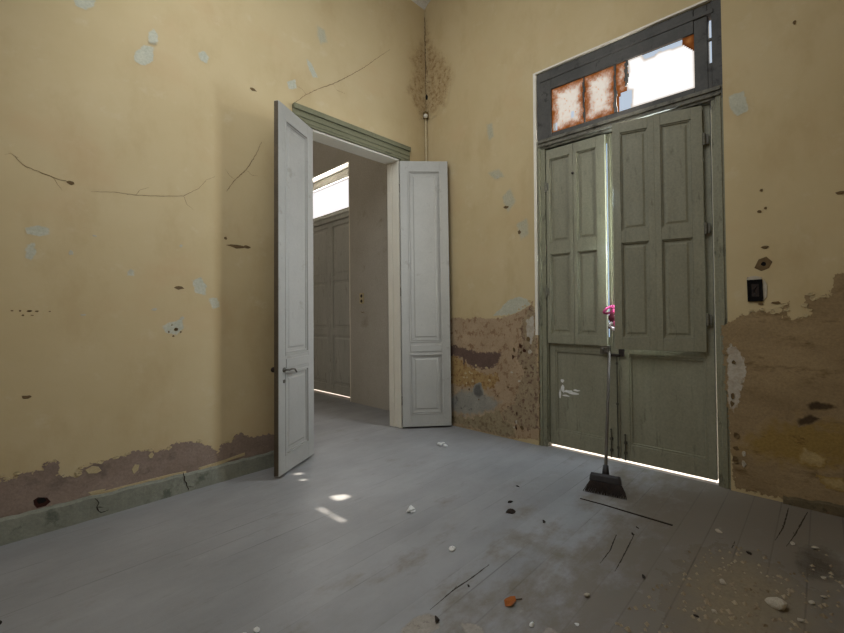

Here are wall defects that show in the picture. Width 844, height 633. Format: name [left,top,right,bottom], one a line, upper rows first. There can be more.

peeling [133,28,159,66]
crack [296,54,383,102]
crack [9,153,66,186]
peeling [450,296,541,442]
peeling [720,273,844,505]
peeling [0,432,274,518]
leakage [730,408,844,492]